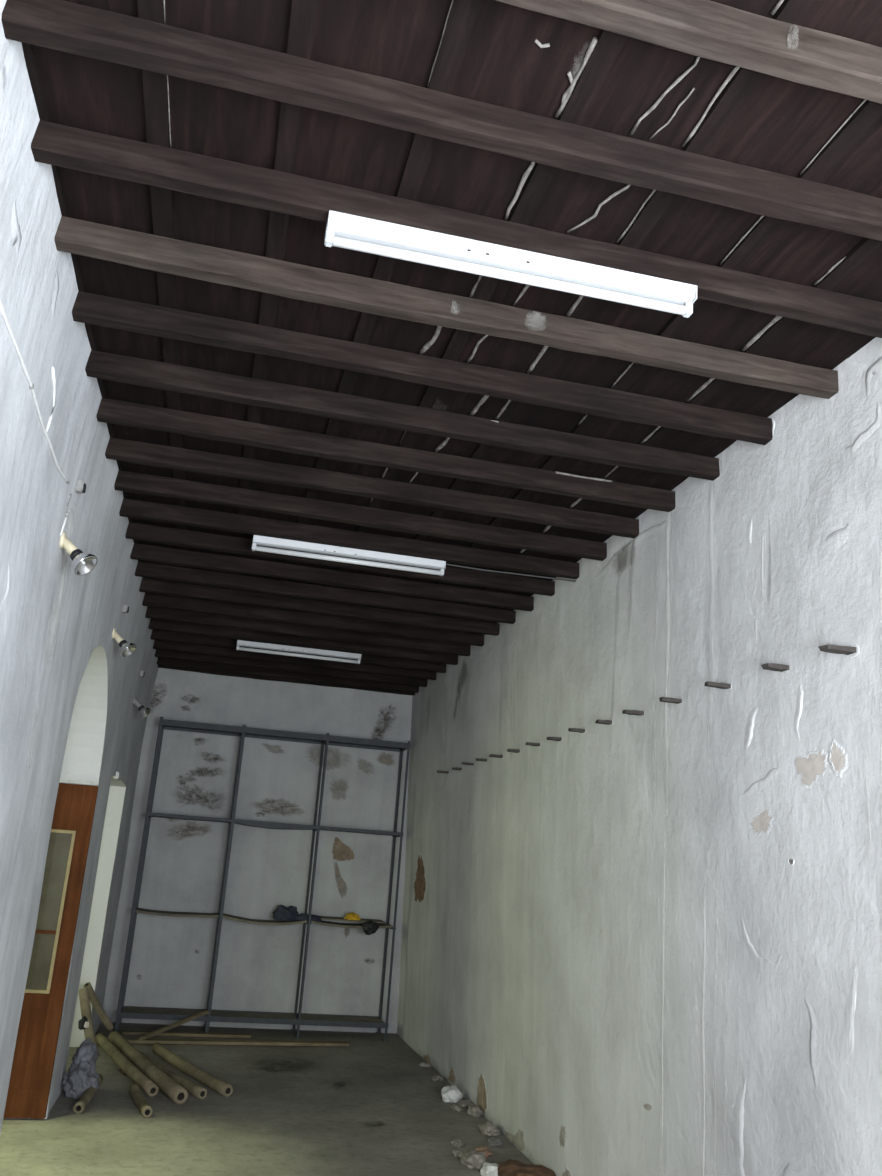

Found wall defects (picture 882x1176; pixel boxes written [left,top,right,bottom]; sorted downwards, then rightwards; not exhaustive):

flaking render [794,683,848,789]
water stain [180,754,220,808]
spalling [330,836,356,862]
spalling [414,853,427,905]
spalling [476,1073,487,1115]